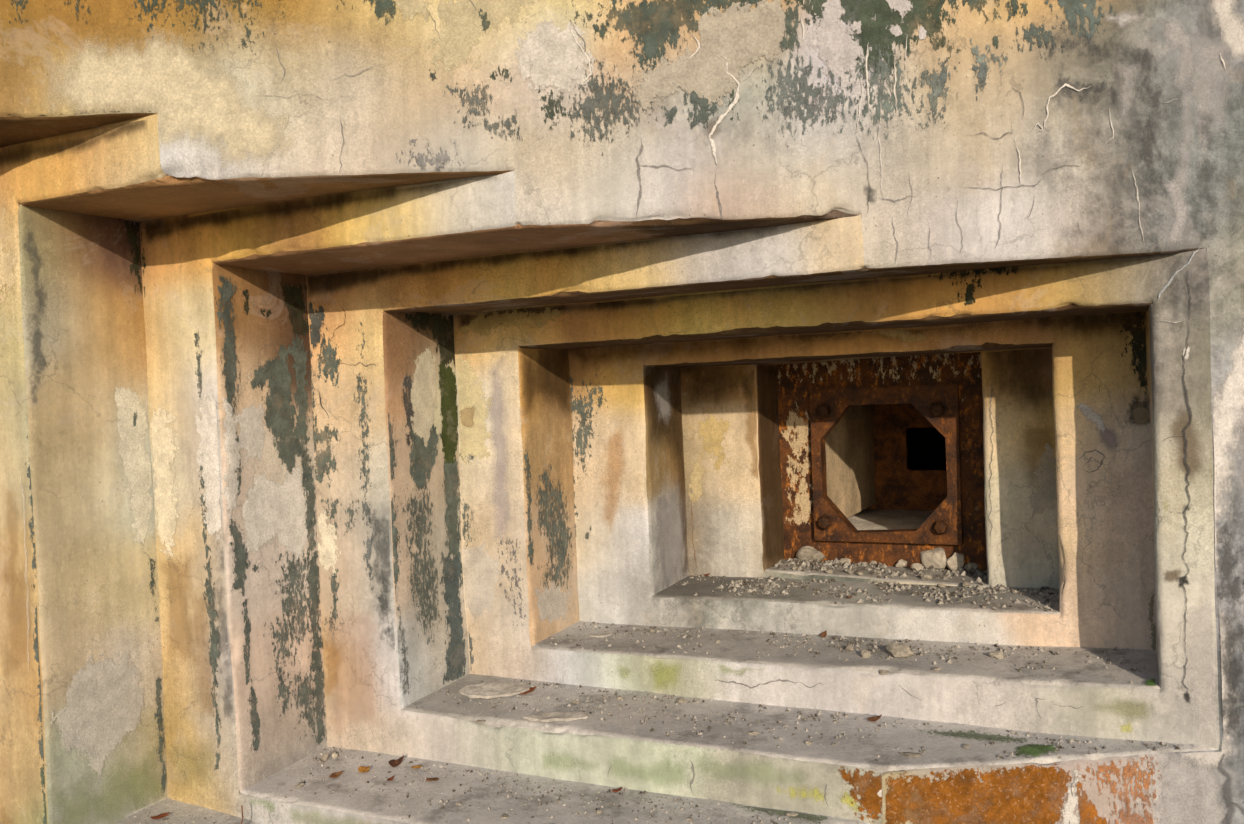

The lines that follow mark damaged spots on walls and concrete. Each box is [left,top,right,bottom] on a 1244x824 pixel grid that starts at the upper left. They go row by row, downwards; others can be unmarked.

crack [635,34,756,217]
peeling [807,0,866,121]
peeling [886,0,913,37]
crack [856,76,1114,261]
leakage [1166,180,1187,241]
crack [1158,248,1200,702]
leakage [1213,336,1244,601]
leakage [1179,617,1244,767]
corrosion [834,754,1162,824]
crack [1218,754,1244,824]